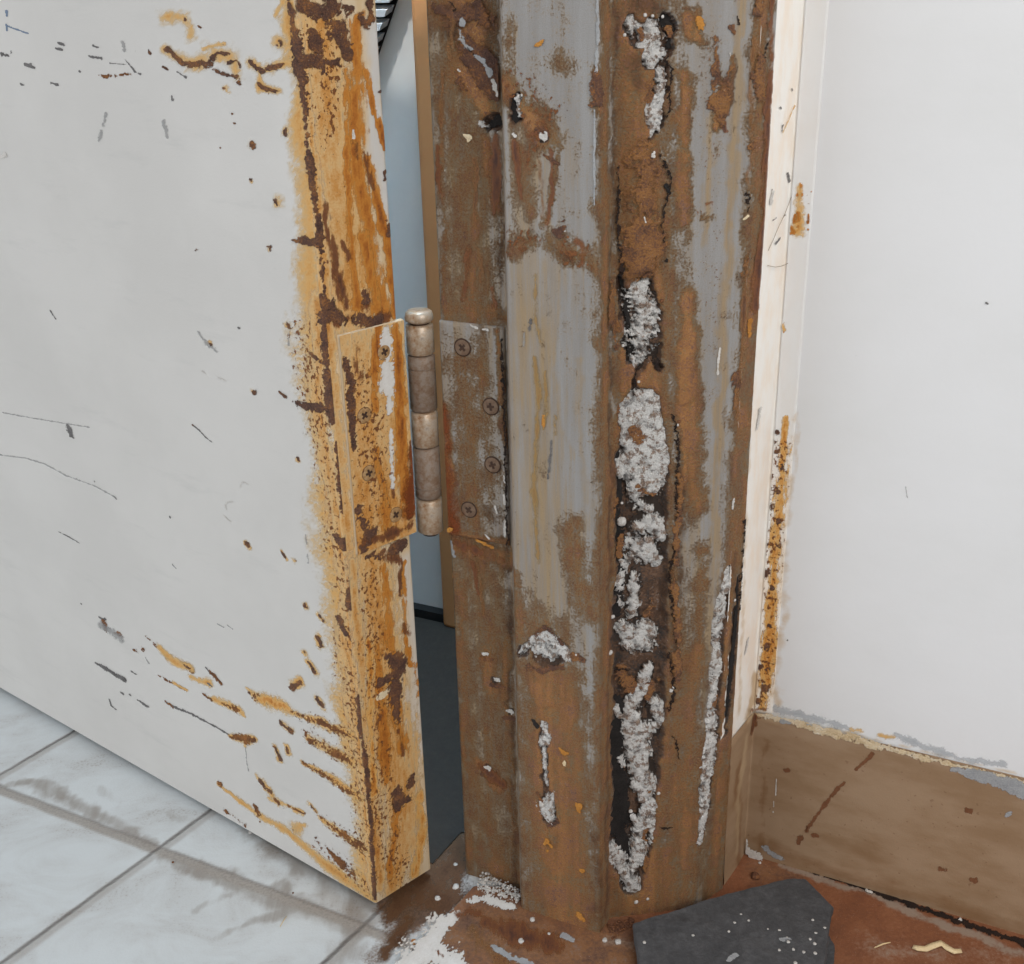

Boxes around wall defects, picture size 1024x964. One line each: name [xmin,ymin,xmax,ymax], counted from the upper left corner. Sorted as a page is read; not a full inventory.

rust [431,0,599,310]
rust [587,71,604,108]
rust [615,137,672,282]
rust [695,16,736,133]
rust [730,0,775,419]
rust [790,183,812,236]
rust [160,0,470,961]
rust [443,408,505,615]
rust [751,415,792,735]
peeling [755,712,1024,800]
leakage [490,945,534,964]